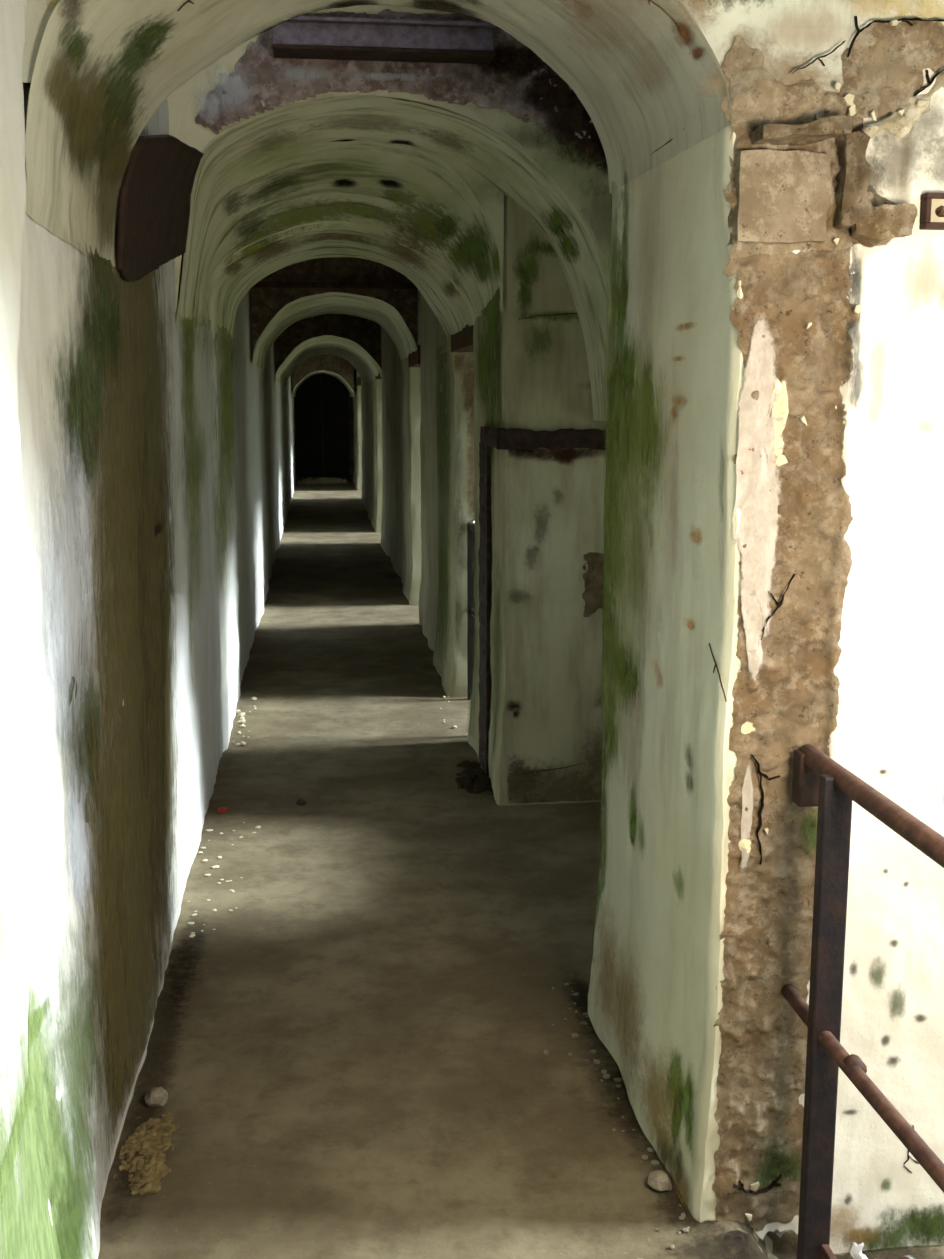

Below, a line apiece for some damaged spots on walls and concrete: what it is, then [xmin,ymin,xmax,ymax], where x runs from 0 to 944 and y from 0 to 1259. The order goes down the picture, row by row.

spalling [195,0,572,134]
rust [676,22,702,59]
crack [790,16,944,75]
crack [913,69,944,96]
spalling [582,552,604,617]
damp [46,56,202,1196]
spalling [712,18,944,1232]
crack [709,643,727,702]
damp [507,734,604,803]
crack [903,1125,919,1173]